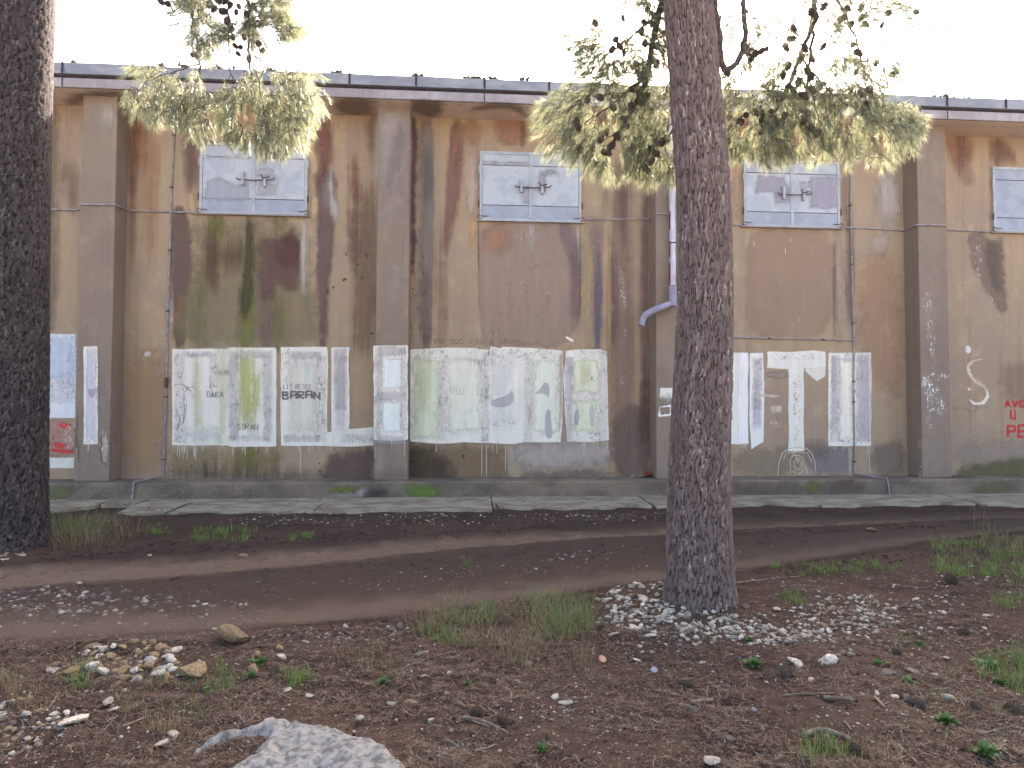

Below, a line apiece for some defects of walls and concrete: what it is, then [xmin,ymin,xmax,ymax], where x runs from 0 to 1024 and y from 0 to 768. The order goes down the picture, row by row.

leakage [170,131,338,348]
rust [316,114,331,173]
rust [444,125,461,247]
leakage [969,232,1007,311]